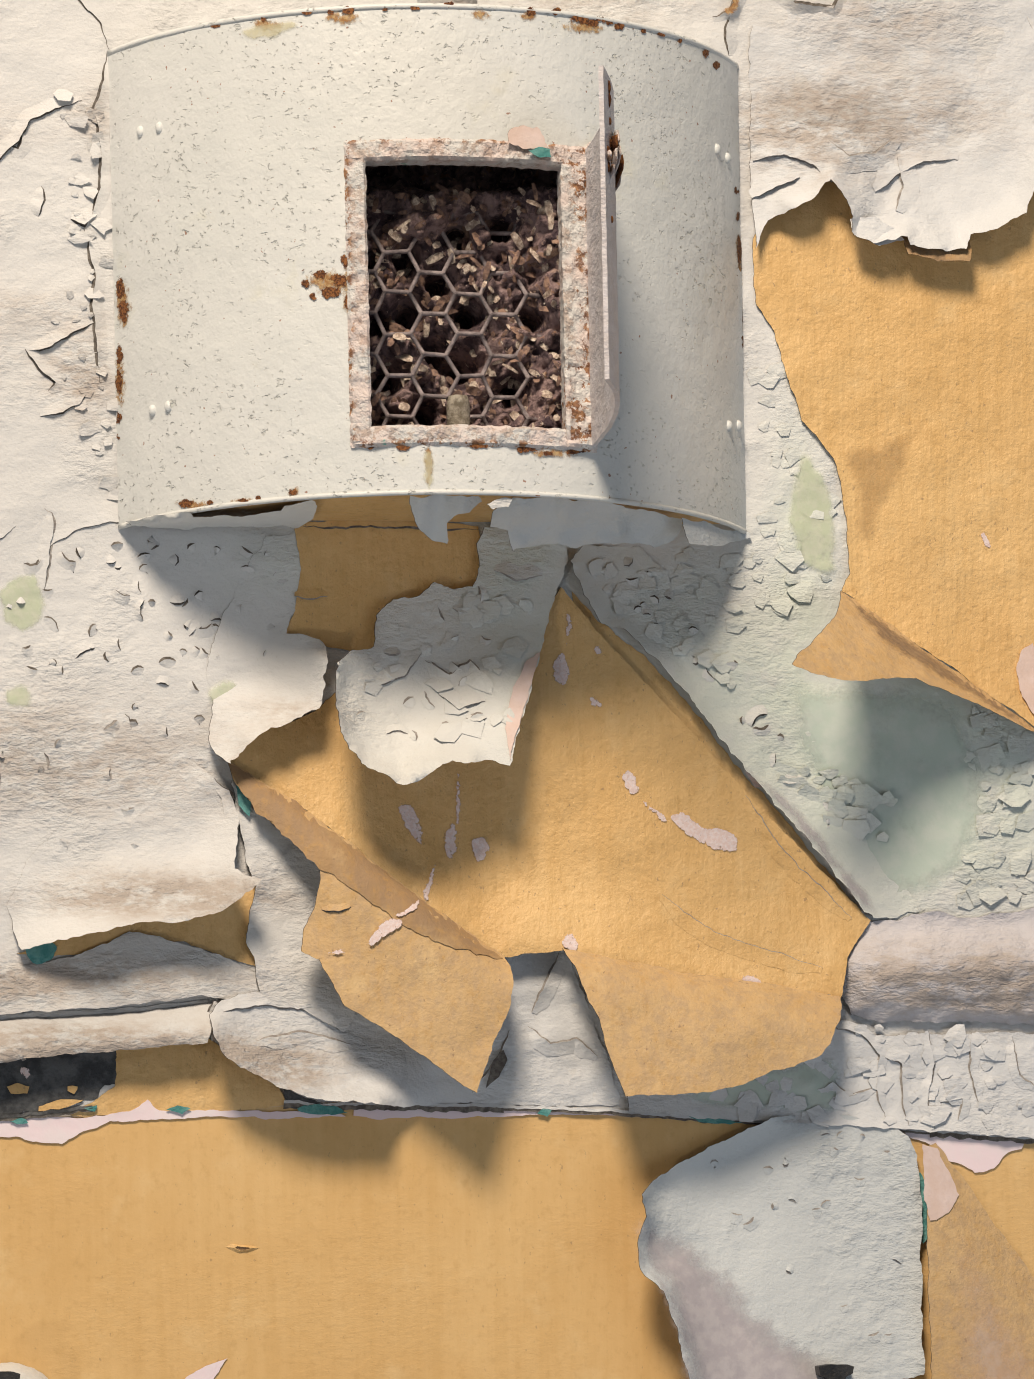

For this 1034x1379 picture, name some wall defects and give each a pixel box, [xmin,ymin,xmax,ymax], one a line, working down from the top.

crack [0,0,113,417]
crack [713,0,846,56]
peeling [747,0,1034,732]
peeling [0,521,1034,1379]